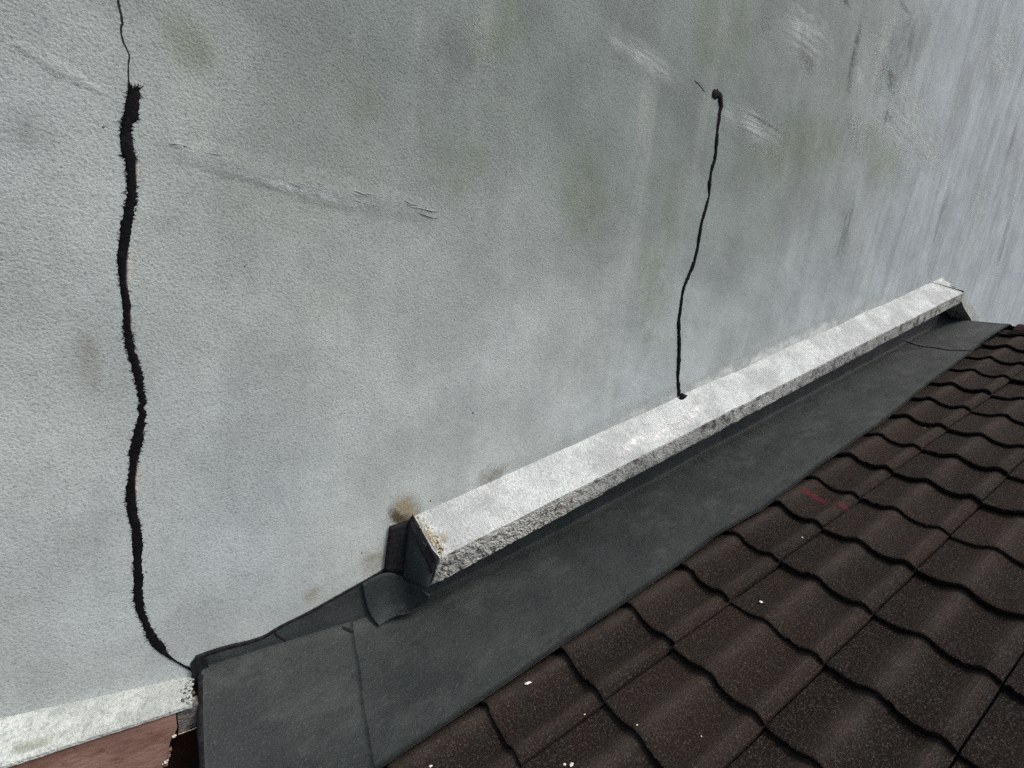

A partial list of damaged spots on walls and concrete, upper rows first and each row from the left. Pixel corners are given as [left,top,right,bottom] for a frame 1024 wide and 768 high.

crack [114,0,191,671]
crack [676,81,724,400]